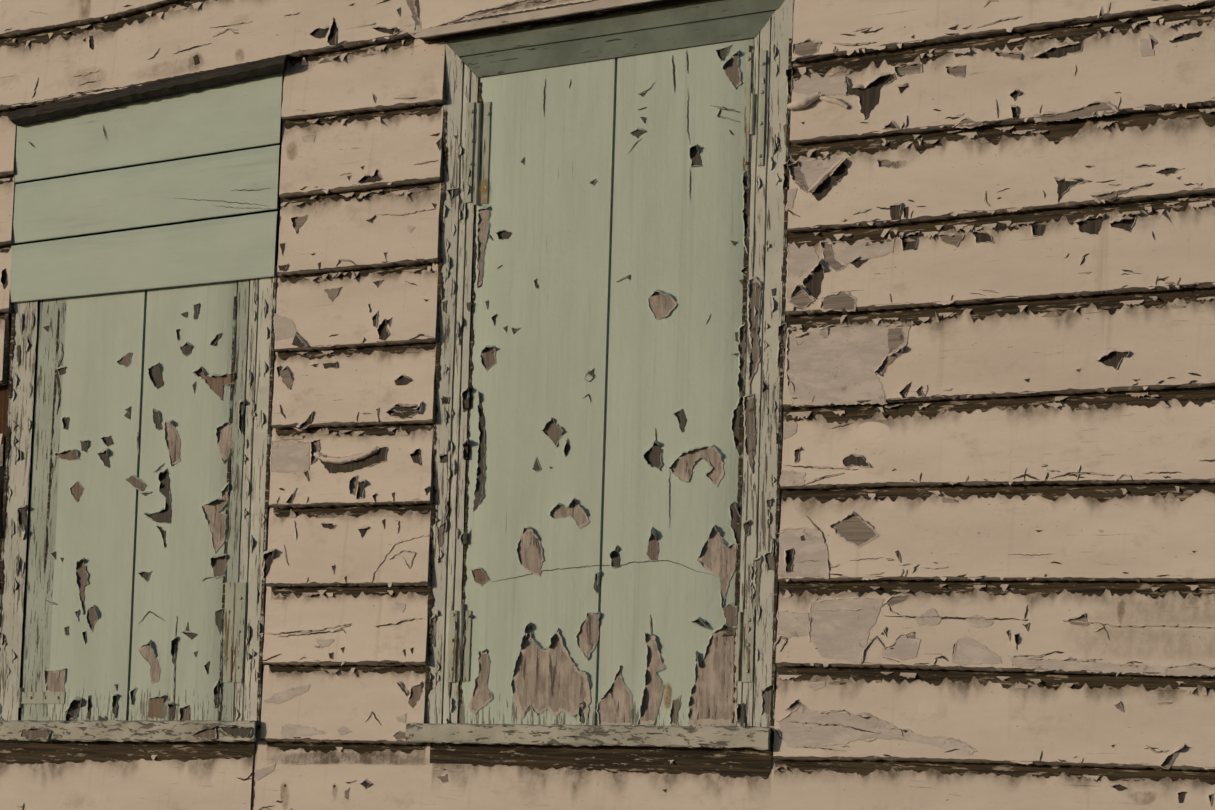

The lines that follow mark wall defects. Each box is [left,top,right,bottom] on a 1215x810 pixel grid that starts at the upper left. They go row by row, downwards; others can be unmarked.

peeling [0,0,217,50]
peeling [289,0,422,66]
peeling [277,165,512,313]
peeling [49,551,100,644]
peeling [55,436,113,468]
peeling [125,408,181,549]
peeling [251,537,428,612]
peeling [215,294,467,562]
crack [374,409,453,572]
crack [491,560,715,582]
crack [749,465,884,652]
peeling [436,0,1215,807]